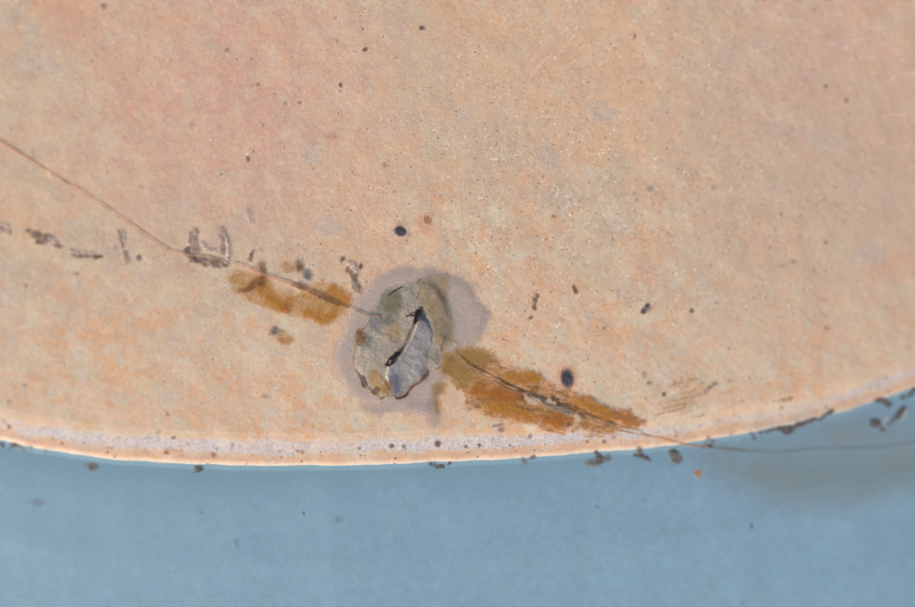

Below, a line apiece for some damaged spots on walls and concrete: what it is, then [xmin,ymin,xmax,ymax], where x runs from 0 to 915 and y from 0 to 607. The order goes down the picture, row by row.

crack [0,140,316,295]
rust [228,255,350,325]
rust [434,347,646,439]
crack [340,280,915,453]